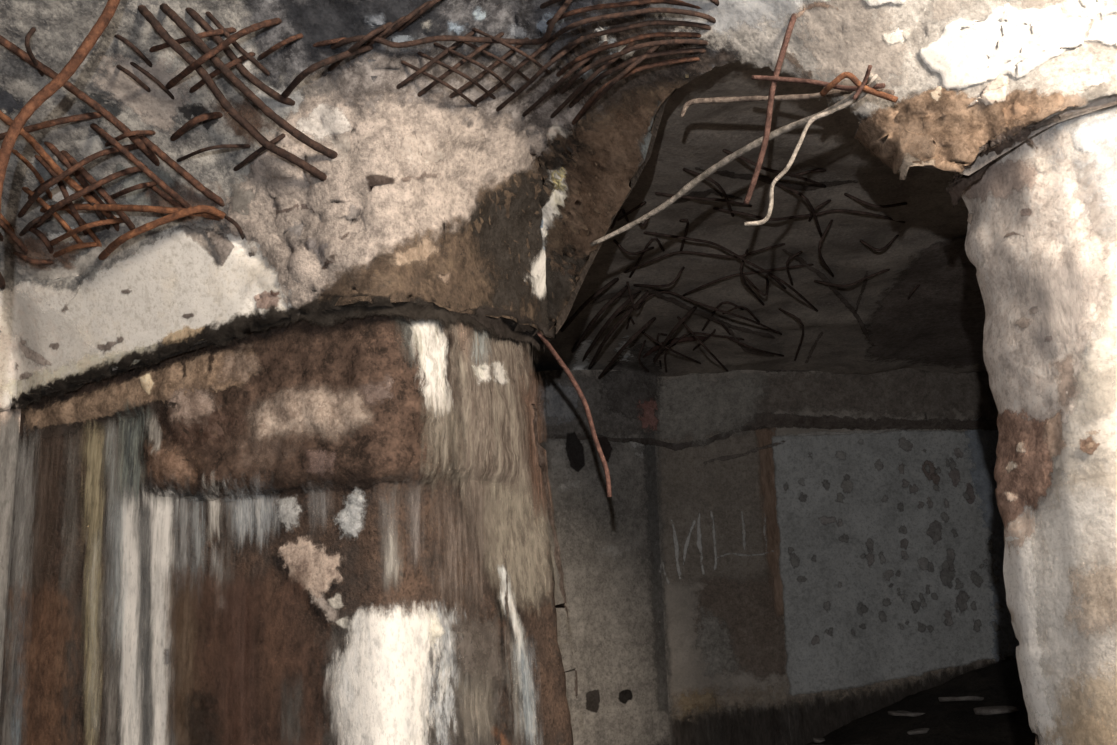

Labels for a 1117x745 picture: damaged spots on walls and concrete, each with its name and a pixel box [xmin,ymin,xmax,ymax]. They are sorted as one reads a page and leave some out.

rust [7,226,79,270]
rust [146,182,217,222]
spalling [0,0,579,503]
spalling [573,340,592,370]
water stain [242,0,1016,745]
spalling [600,336,664,431]
peeling [650,0,1117,745]
water stain [0,412,364,745]
flaking render [278,536,349,628]
water stain [1045,669,1117,745]